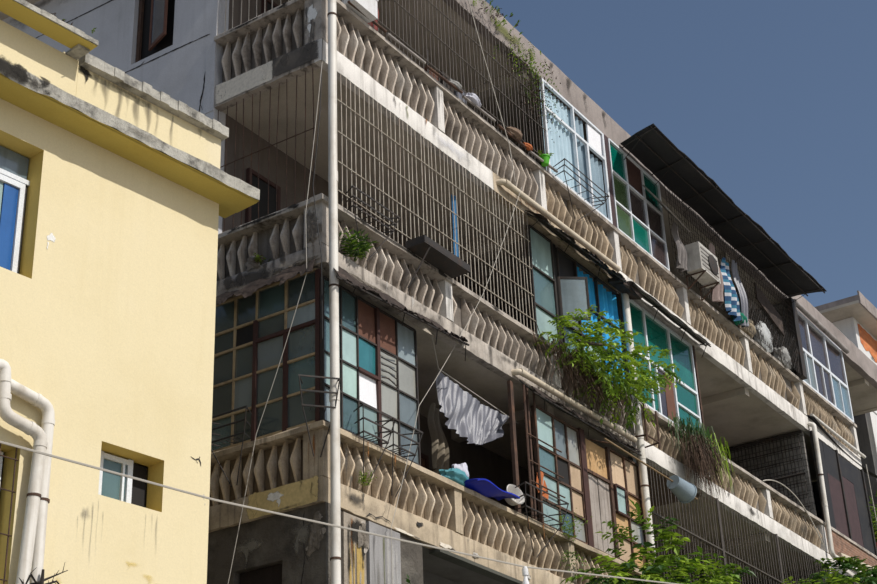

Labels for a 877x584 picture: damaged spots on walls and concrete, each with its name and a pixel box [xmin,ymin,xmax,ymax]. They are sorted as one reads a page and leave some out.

mould [0,57,60,97]
flaking render [857,323,877,363]
peeling [247,476,319,519]
damp [348,520,365,574]